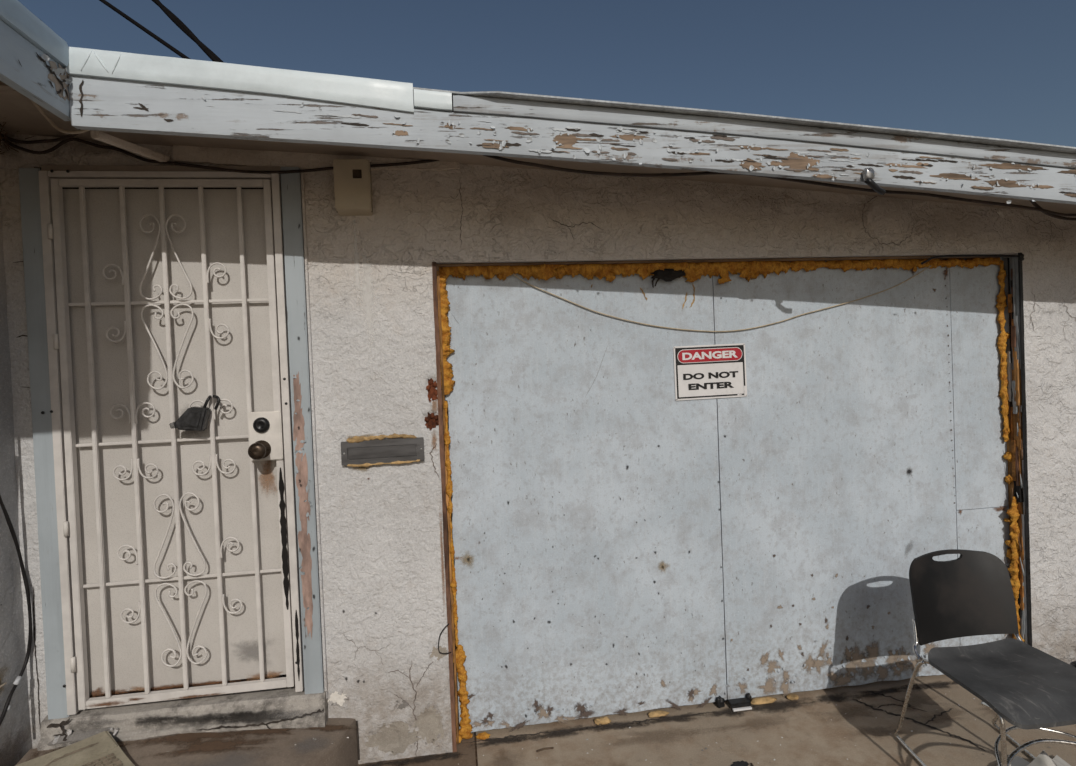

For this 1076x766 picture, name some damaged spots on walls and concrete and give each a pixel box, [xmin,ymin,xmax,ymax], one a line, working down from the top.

peeling [41,53,71,101]
peeling [318,106,420,143]
peeling [439,120,1076,201]
crack [1030,288,1076,340]
peeling [293,371,315,648]
crack [344,635,437,760]
peeling [472,700,594,731]
peeling [666,626,935,710]